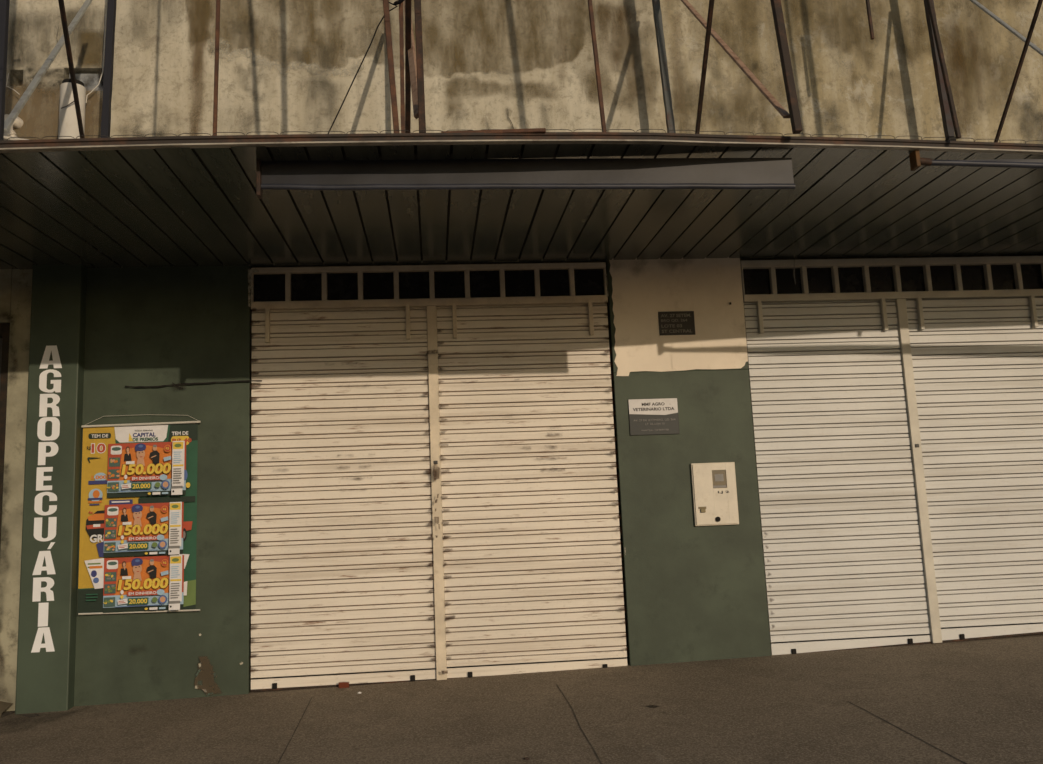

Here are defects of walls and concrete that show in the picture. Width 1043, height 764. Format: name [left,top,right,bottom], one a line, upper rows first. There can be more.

damp [193,0,262,68]
damp [293,0,343,68]
damp [412,0,550,110]
damp [569,0,622,60]